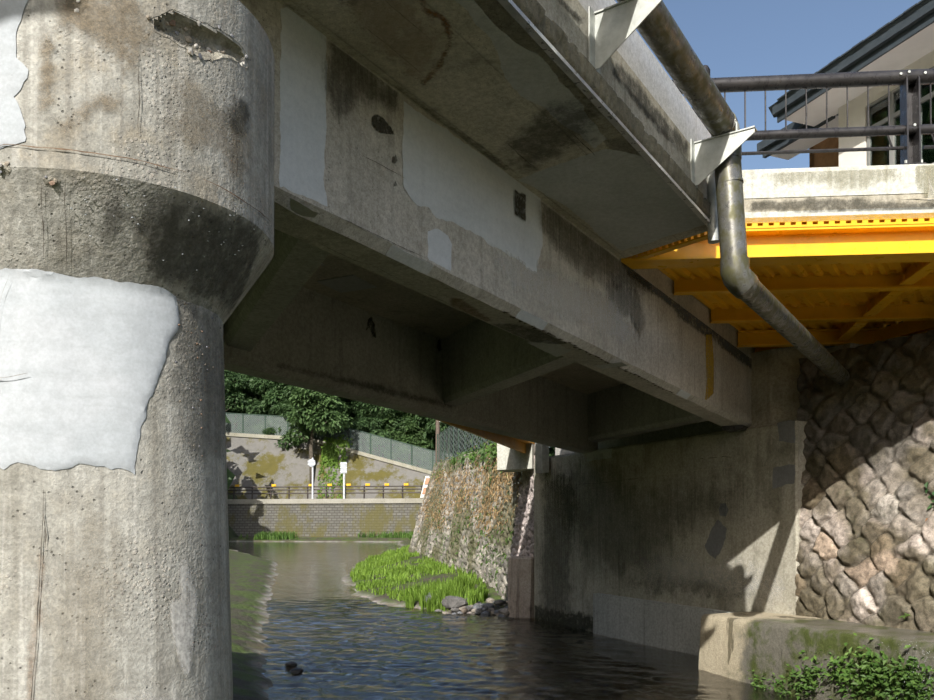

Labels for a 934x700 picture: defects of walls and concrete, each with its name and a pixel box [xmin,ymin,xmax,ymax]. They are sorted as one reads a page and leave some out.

spalling [146,9,249,70]
damp [229,100,249,130]
damp [131,196,259,307]
crack [31,490,47,700]
damp [535,480,593,634]